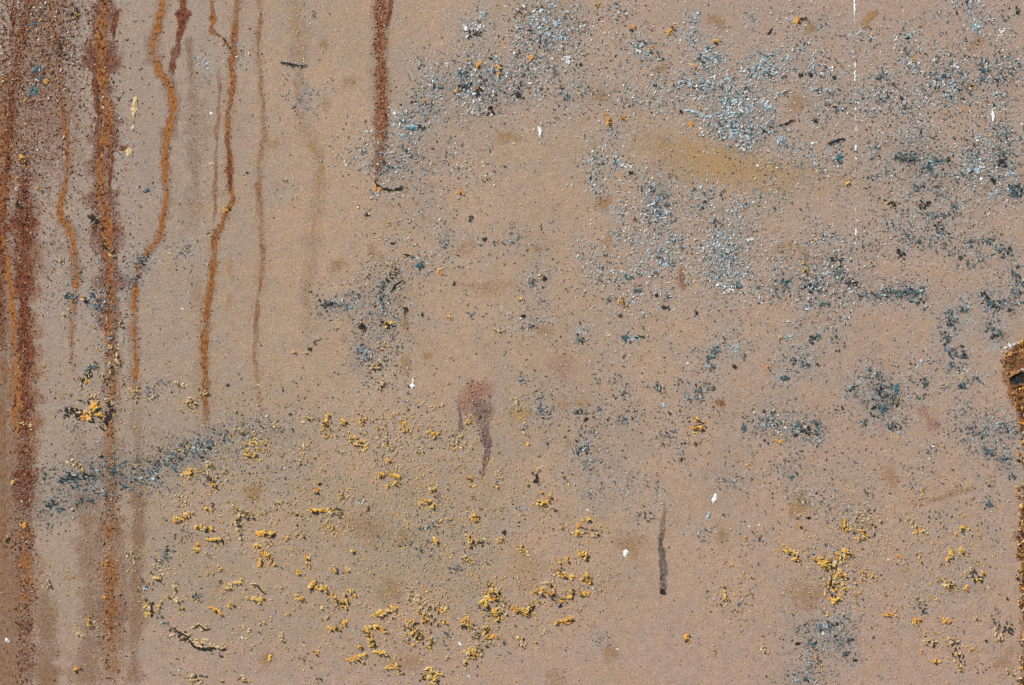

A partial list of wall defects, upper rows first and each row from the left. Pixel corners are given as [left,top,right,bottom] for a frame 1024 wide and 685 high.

rust [0,0,648,685]
leakage [658,505,668,595]
rust [700,333,1024,685]